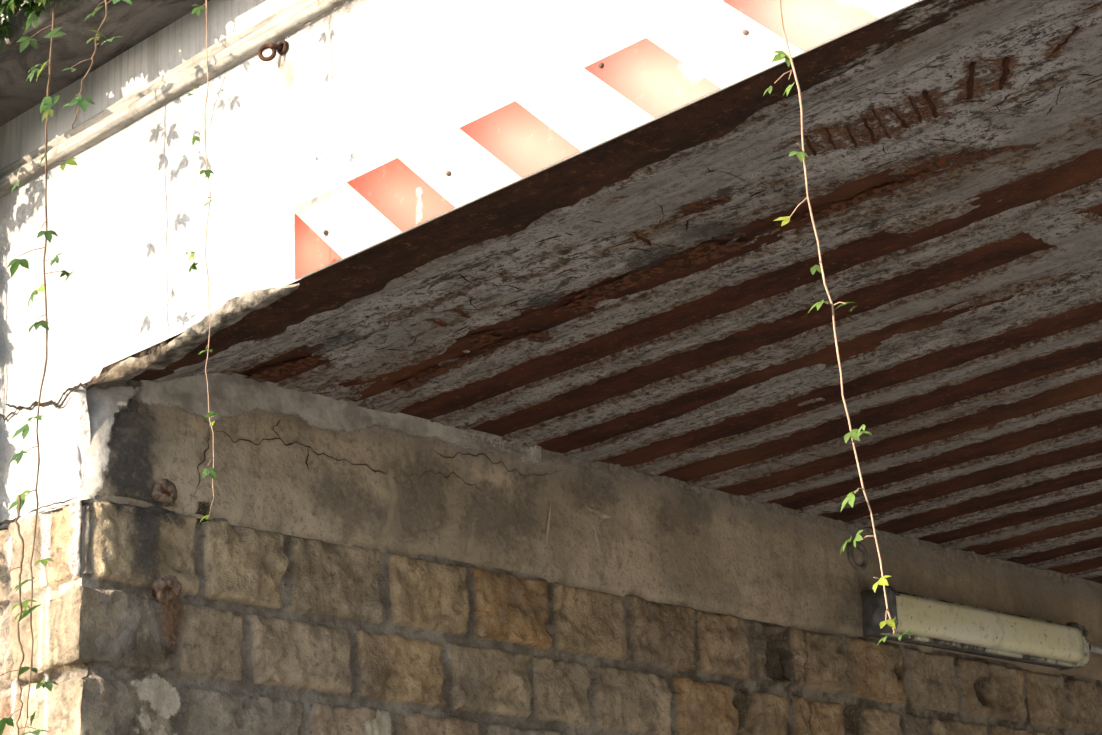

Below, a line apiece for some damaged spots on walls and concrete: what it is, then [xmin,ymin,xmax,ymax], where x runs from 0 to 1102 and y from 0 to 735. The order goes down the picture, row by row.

spalling [1044,26,1082,60]
spalling [794,57,1022,156]
spalling [672,197,731,231]
spalling [755,139,1040,226]
crack [0,343,170,421]
spalling [100,283,300,383]
spalling [409,306,469,333]
spalling [392,331,553,392]
crack [0,497,77,526]
leakage [105,383,180,583]
spalling [195,502,210,524]
crack [193,420,566,496]